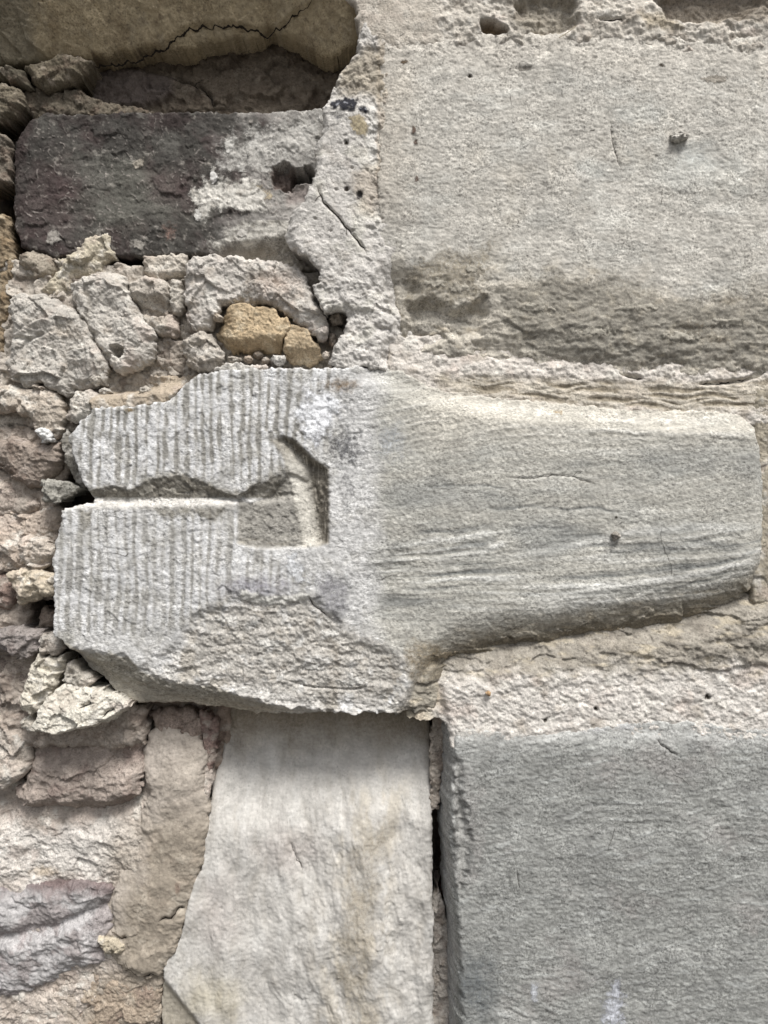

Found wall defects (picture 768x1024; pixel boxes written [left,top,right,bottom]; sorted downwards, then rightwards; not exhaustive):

crack [95,0,312,69]
crack [315,186,367,253]